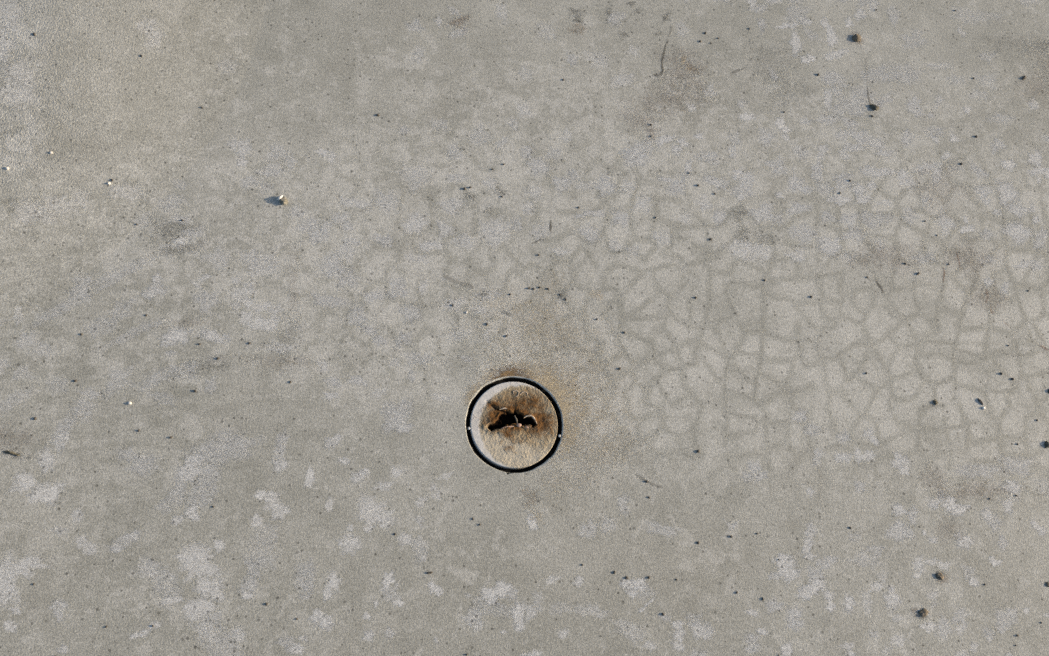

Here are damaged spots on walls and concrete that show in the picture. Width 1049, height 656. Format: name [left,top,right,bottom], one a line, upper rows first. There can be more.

corrosion [449,265,647,531]